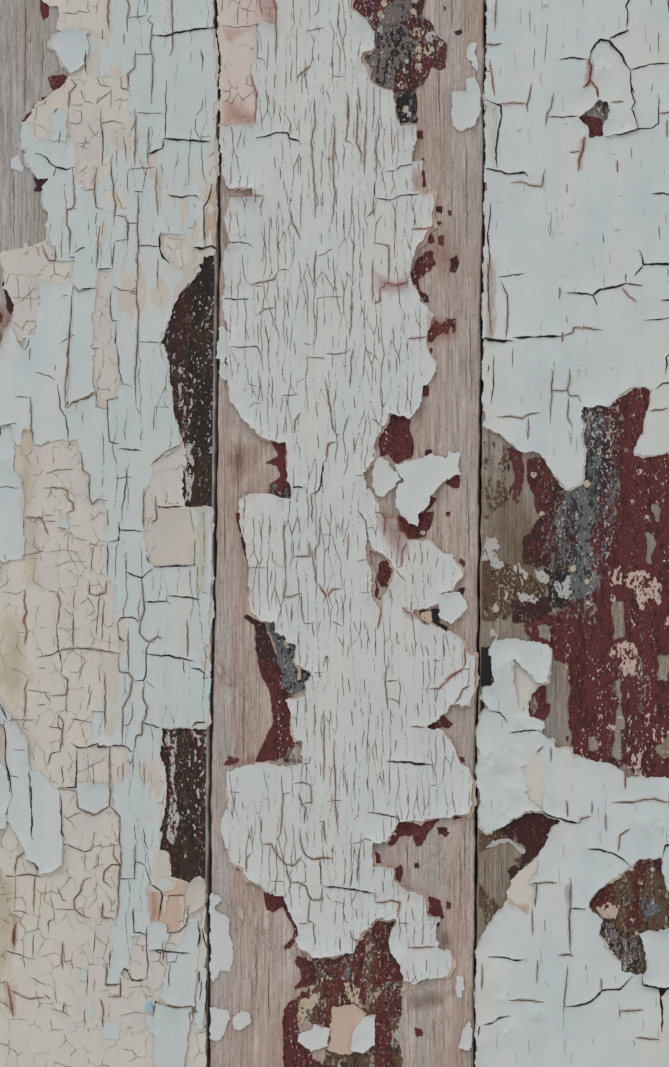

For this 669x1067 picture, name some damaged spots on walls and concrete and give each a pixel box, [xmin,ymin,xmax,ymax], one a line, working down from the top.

peeling [11,155,24,172]
crack [438,0,669,455]
peeling [178,296,228,503]
peeling [372,450,461,526]
peeling [437,592,468,624]
peeling [482,531,572,613]
crack [491,651,563,761]
peeling [165,729,206,859]
crack [438,836,503,913]
crack [478,773,669,1061]
peeling [298,1024,330,1052]
peeling [351,1014,376,1053]